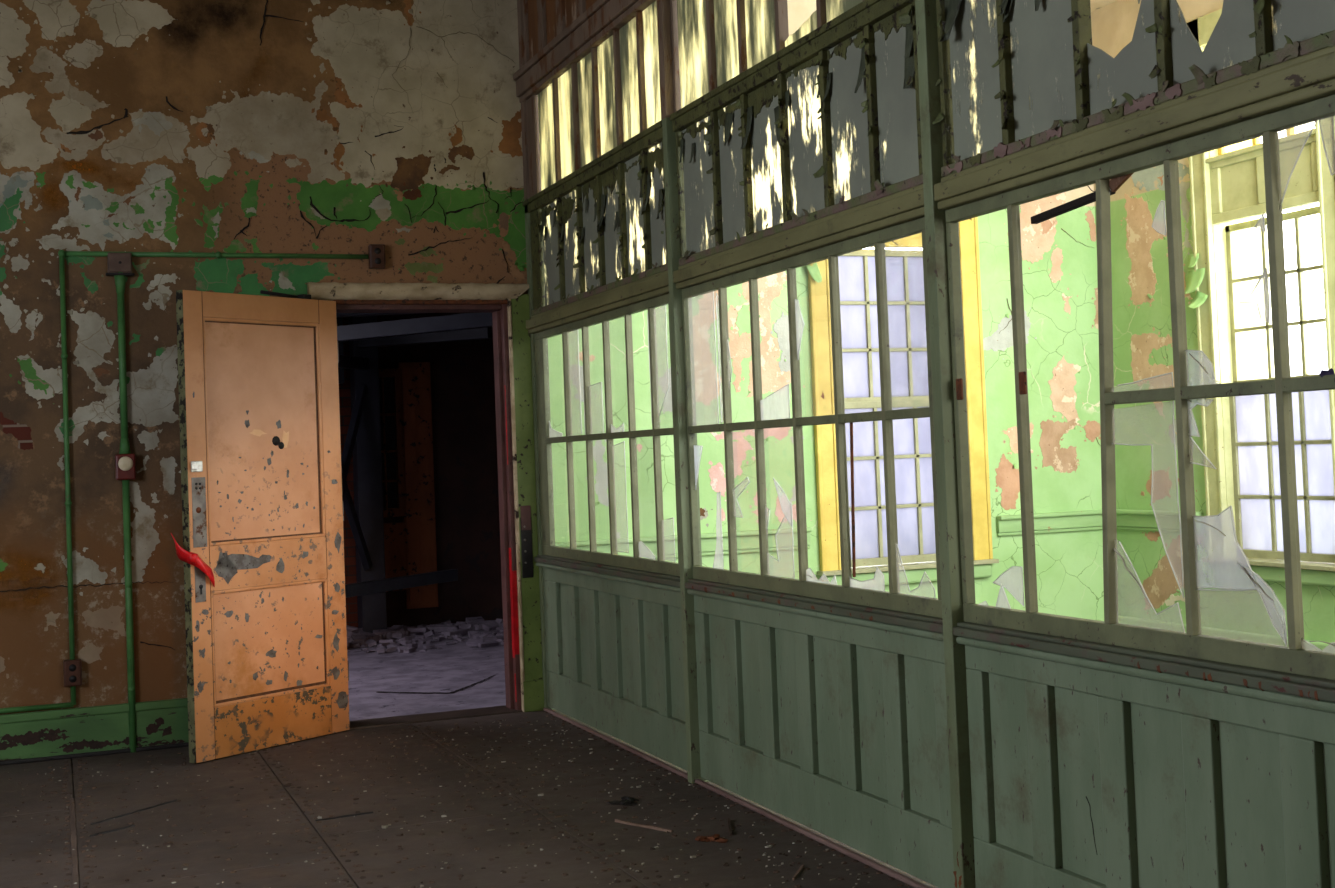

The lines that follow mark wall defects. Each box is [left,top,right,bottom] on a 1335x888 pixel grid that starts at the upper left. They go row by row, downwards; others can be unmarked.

crack [260,0,303,46]
peeling [991,0,1013,68]
crack [67,108,128,134]
crack [300,26,522,284]
peeling [0,0,915,670]